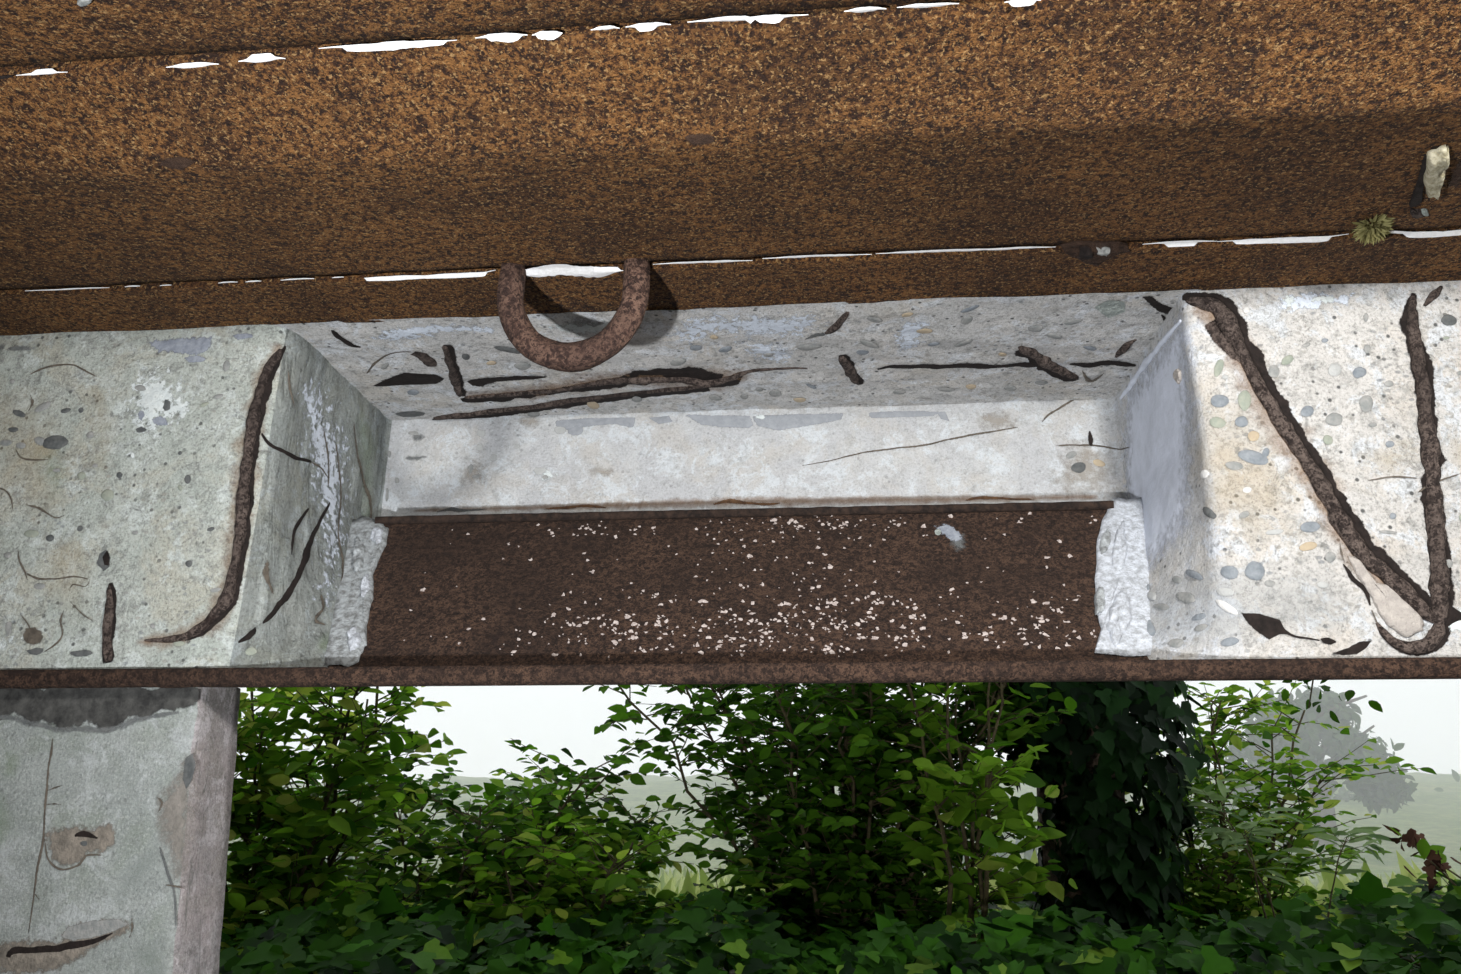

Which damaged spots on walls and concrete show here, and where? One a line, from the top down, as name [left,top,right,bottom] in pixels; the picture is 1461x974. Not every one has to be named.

rust [685,134,714,145]
rust [1059,241,1131,266]
spalling [998,300,1126,385]
peeling [101,336,223,501]
spalling [367,305,979,479]
spalling [144,345,372,647]
rust [419,496,1092,512]
spalling [1143,286,1461,656]
water stain [0,687,199,732]
crack [28,738,62,933]
spalling [44,823,115,871]
spalling [0,919,133,974]